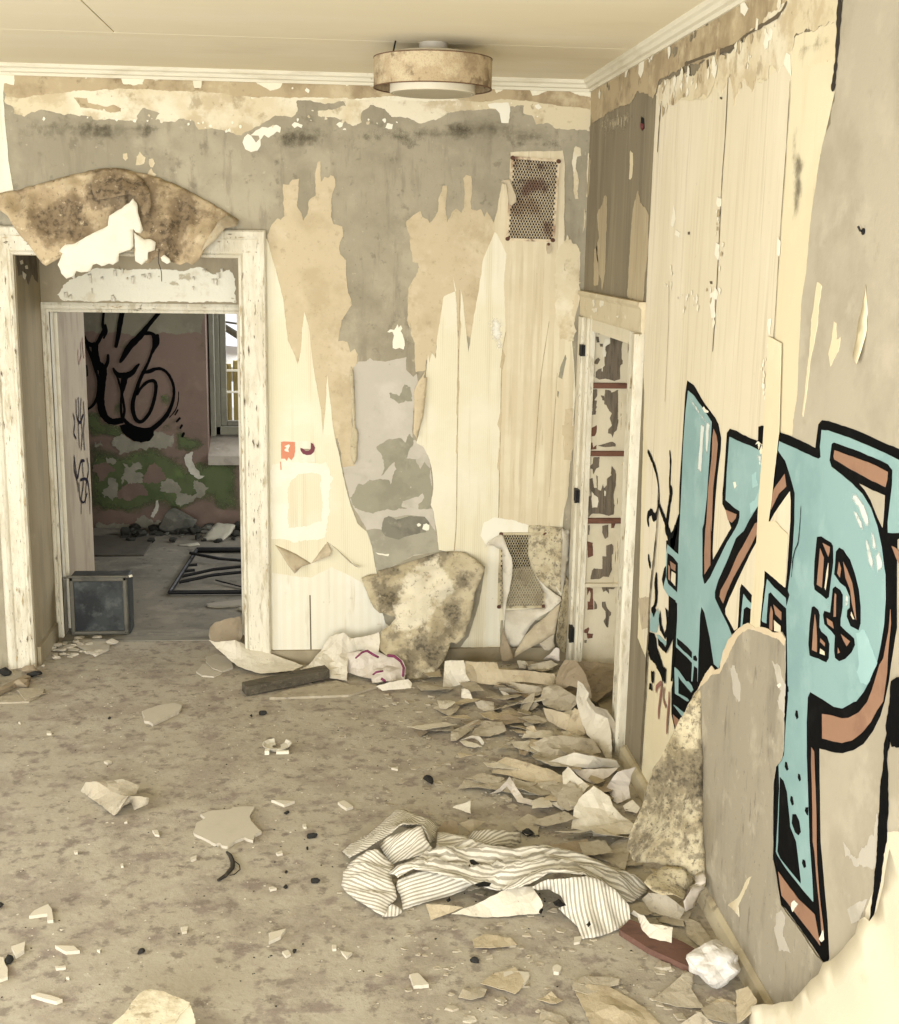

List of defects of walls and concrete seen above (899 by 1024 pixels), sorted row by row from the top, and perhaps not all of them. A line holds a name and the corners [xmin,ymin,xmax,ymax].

flaking render [344,86,458,102]
peeling [572,0,838,117]
peeling [123,152,156,176]
rust [523,180,546,195]
peeling [572,146,589,230]
peeling [2,235,38,300]
peeling [57,267,241,315]
flaking render [554,235,580,342]
peeling [93,431,208,507]
flaking render [343,324,438,572]
peeling [587,333,631,627]
peeling [486,525,570,661]